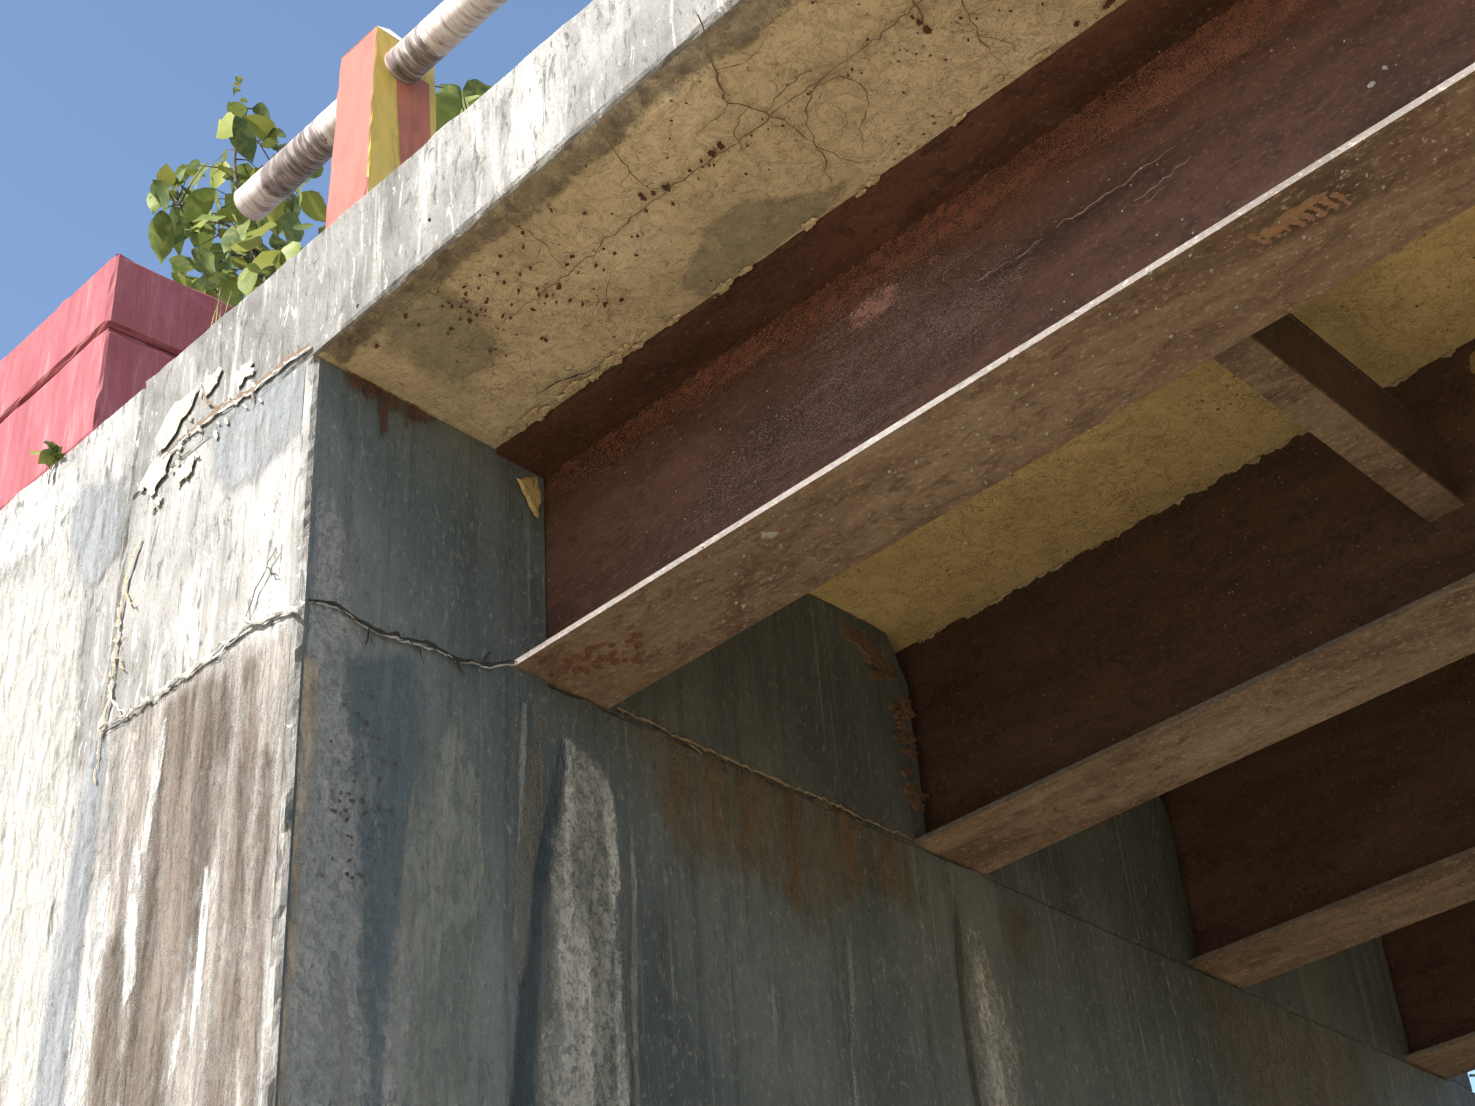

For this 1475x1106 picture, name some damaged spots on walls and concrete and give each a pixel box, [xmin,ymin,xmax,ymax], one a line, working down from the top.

crack [961,0,1019,60]
crack [456,0,927,353]
rust [552,0,1317,492]
spalling [138,359,262,512]
crack [162,342,310,459]
crack [536,356,619,394]
peeling [0,467,79,569]
crack [93,536,518,781]
water stain [0,478,489,1106]
crack [617,708,913,842]